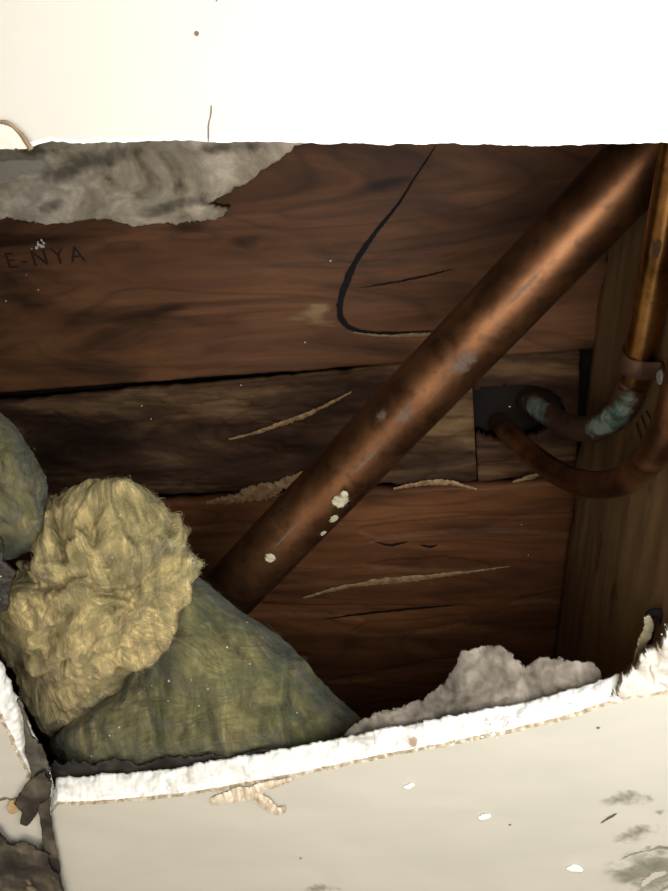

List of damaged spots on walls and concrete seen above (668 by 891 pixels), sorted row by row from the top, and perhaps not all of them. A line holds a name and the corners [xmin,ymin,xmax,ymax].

peeling [0,120,33,151]
crack [337,145,451,338]
spalling [611,623,668,700]
damp [617,846,668,891]